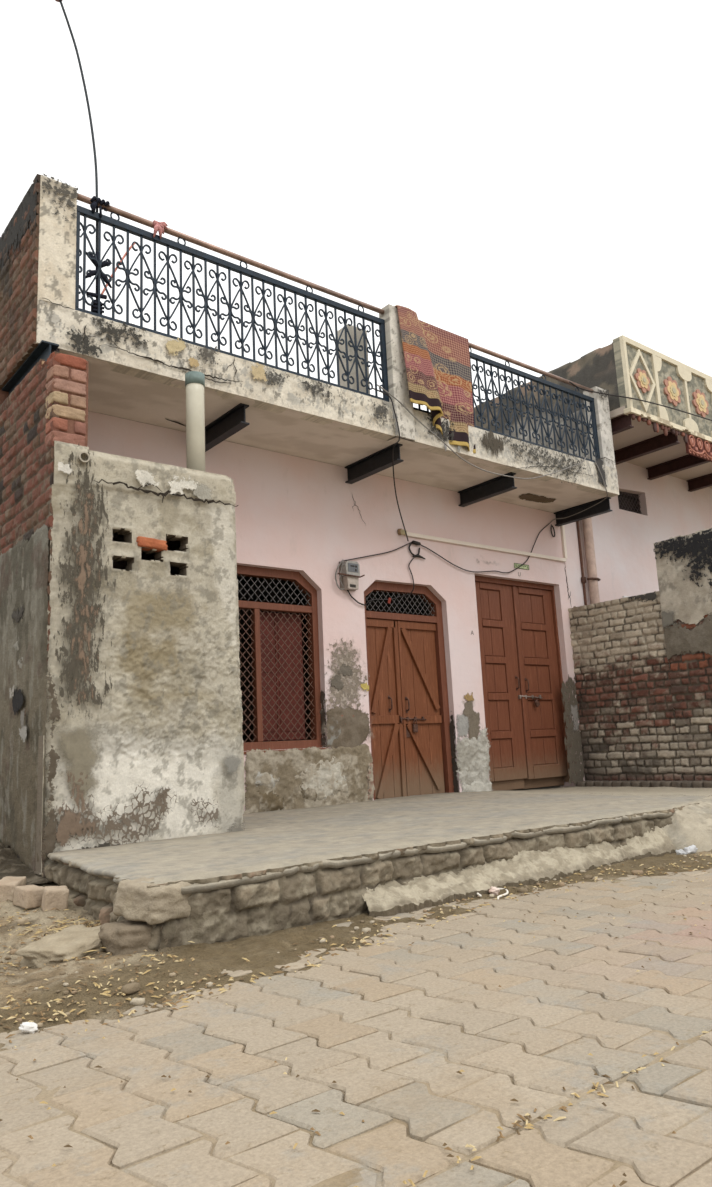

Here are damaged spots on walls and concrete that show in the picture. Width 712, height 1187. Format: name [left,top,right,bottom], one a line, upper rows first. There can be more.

water stain [67,317,149,358]
water stain [193,345,220,365]
water stain [264,365,332,398]
water stain [373,403,399,435]
crack [94,479,238,507]
water stain [653,529,712,594]
flaking render [663,612,712,659]
flaking render [190,638,375,832]
flaking render [456,692,492,792]